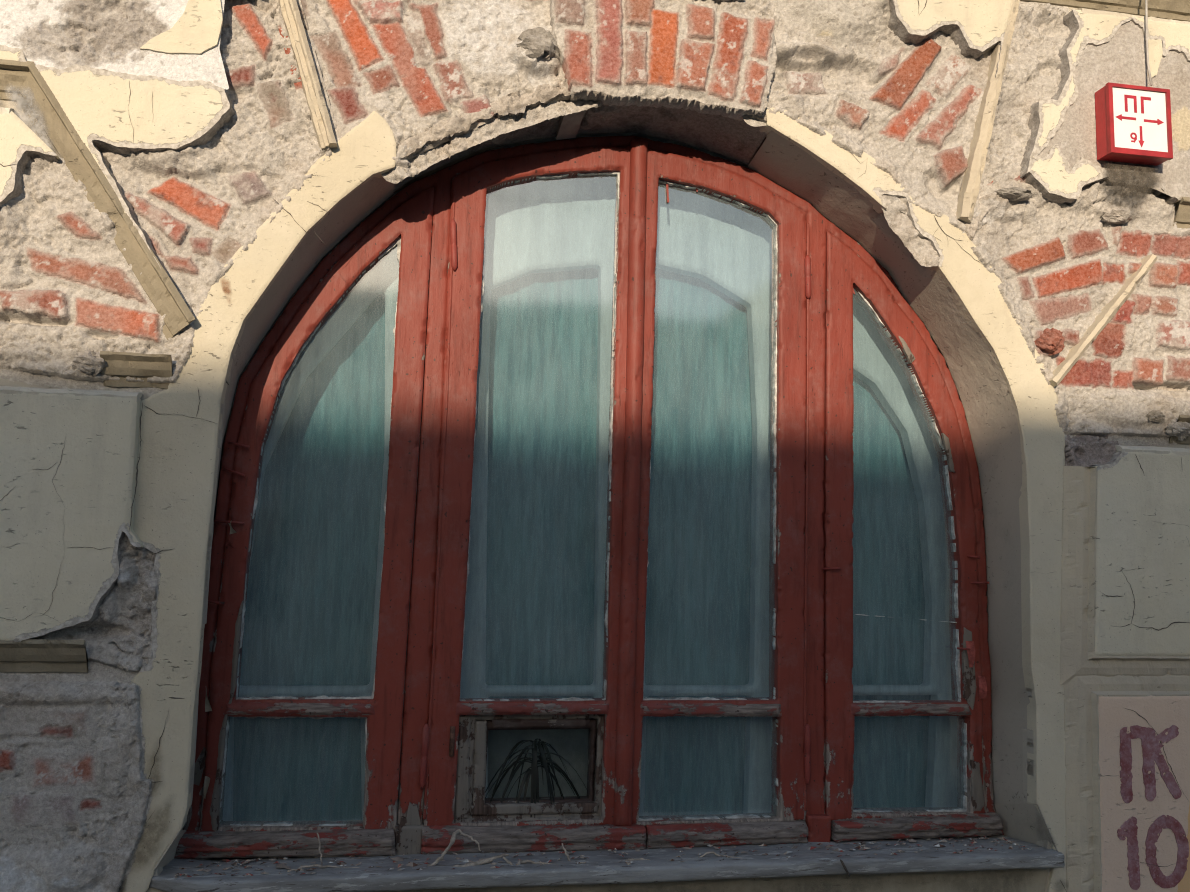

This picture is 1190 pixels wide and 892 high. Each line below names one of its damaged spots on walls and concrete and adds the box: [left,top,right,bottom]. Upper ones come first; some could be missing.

flaking render [0,0,1190,472]
crack [4,438,105,622]
flaking render [0,531,158,892]
crack [129,390,217,530]
peeling [961,627,987,710]
crack [1101,568,1190,631]